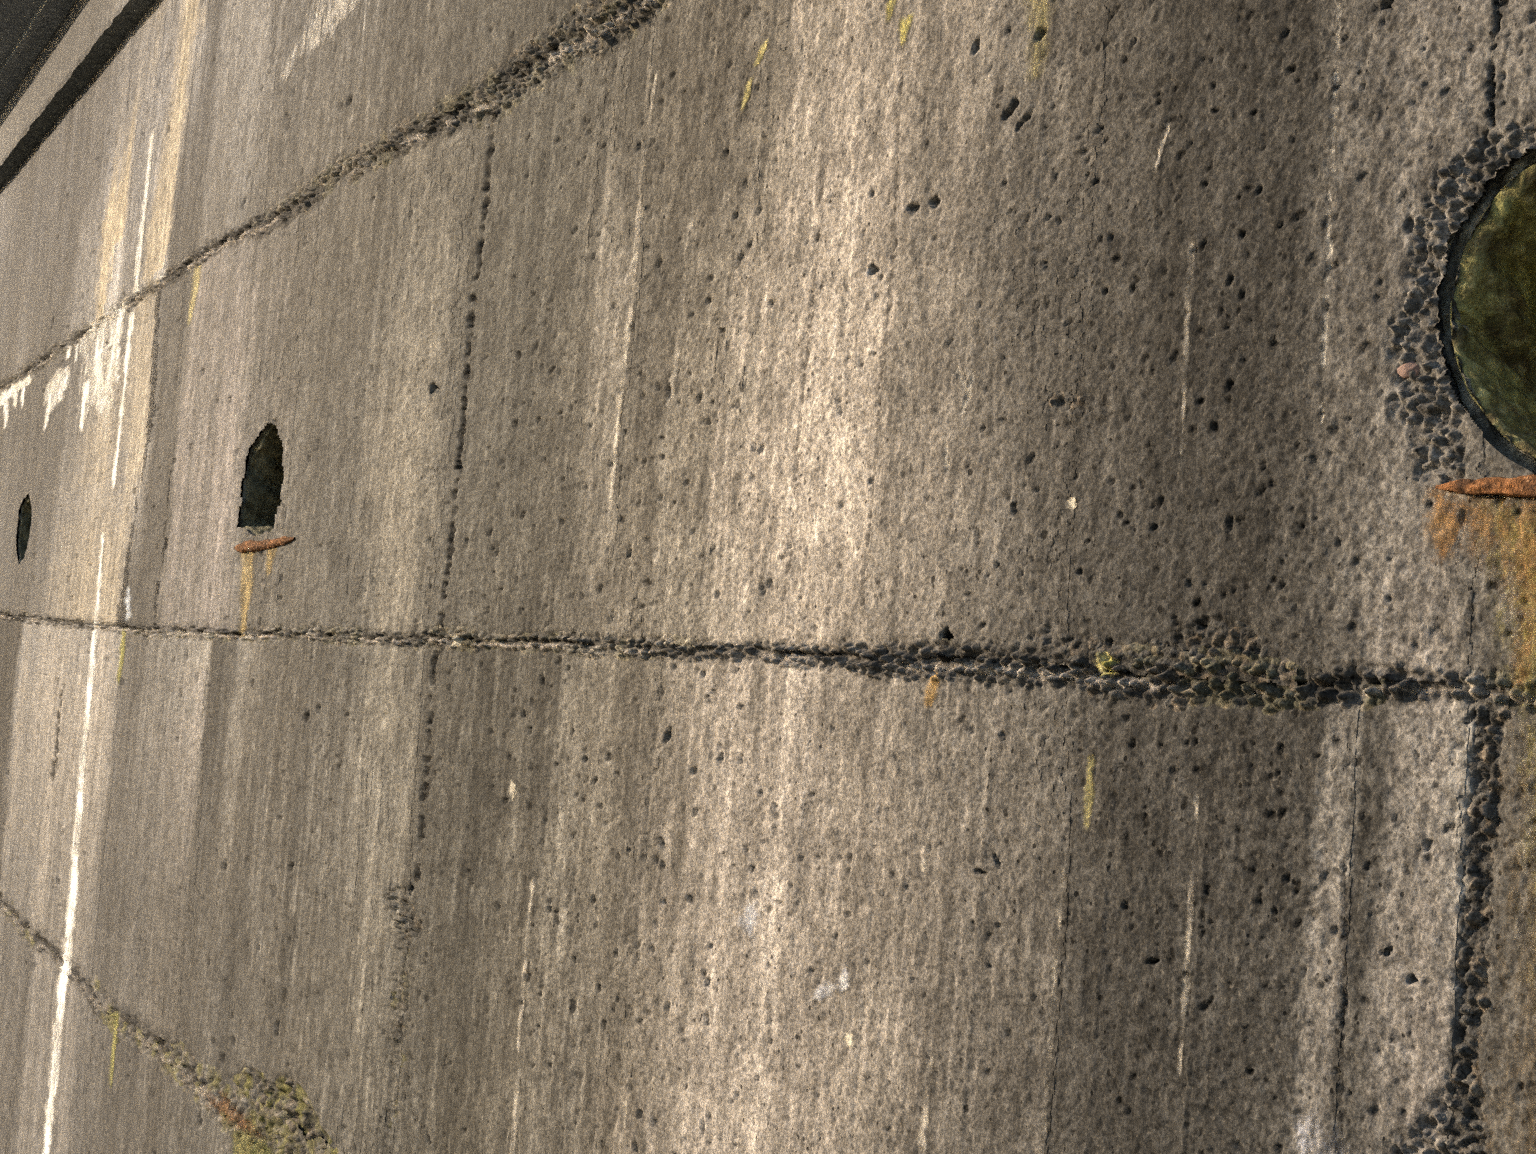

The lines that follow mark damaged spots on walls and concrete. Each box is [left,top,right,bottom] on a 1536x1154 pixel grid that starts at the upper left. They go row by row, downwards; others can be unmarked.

crack [0,0,709,892]
crack [943,368,975,474]
rust [1430,474,1536,557]
water stain [0,0,325,1154]
rust [234,536,295,635]
water stain [563,0,1111,1154]
water stain [1288,0,1536,1154]
crack [761,651,841,661]
crack [885,630,1536,717]